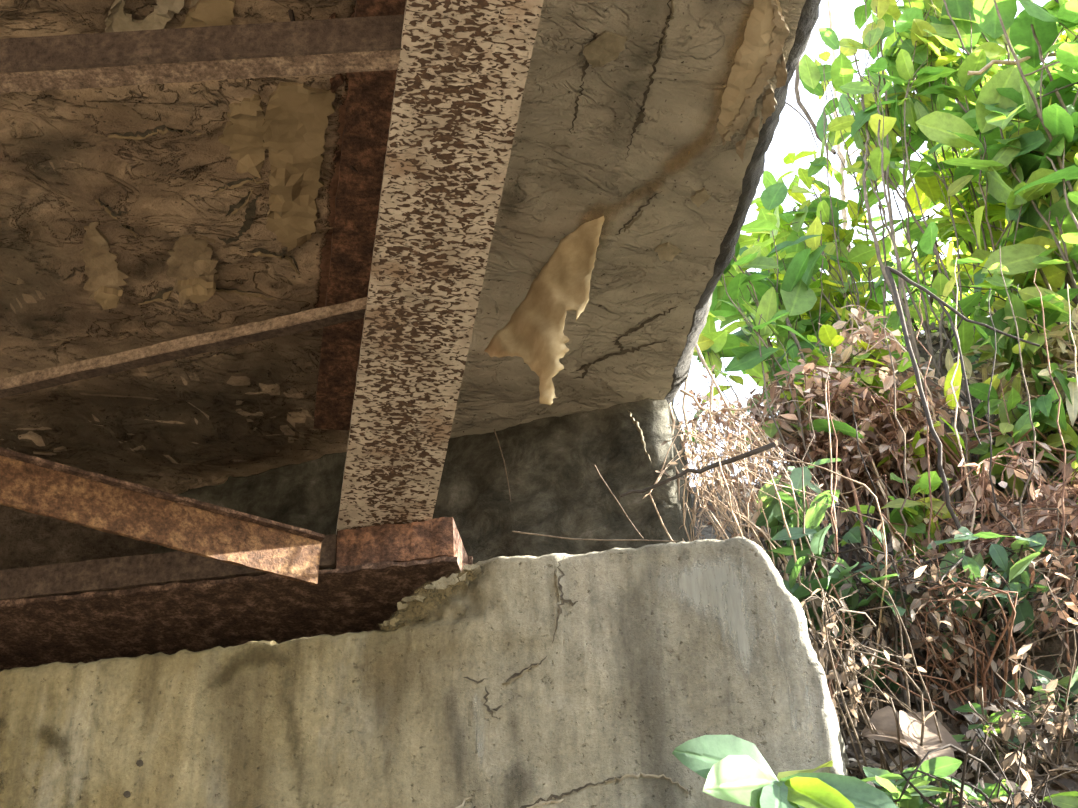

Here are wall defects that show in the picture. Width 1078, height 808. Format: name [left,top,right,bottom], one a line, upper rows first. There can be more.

peeling [95,0,235,33]
crack [569,33,598,134]
crack [625,0,674,162]
corrosion [313,73,349,308]
crack [573,306,678,379]
spalling [378,564,482,631]
crack [463,562,578,719]
crack [520,772,689,808]